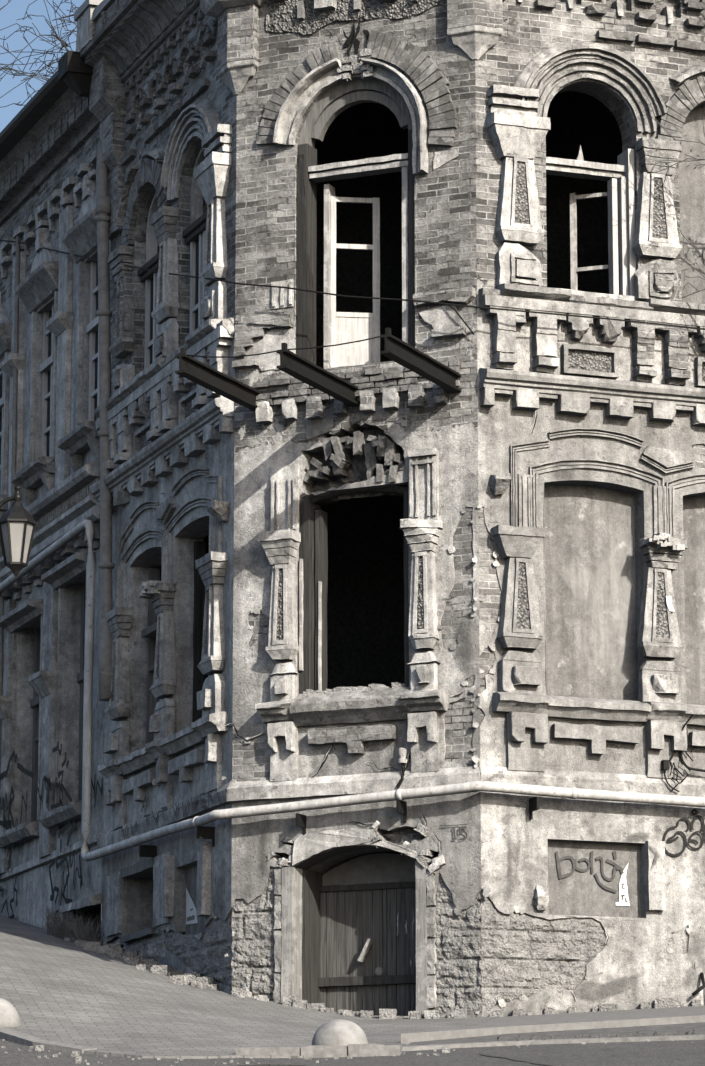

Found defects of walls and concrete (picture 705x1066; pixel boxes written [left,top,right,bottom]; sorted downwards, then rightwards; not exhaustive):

flaking render [388,416,409,444]
flaking render [437,504,501,768]
spalling [103,837,294,1002]
spalling [368,821,607,1017]